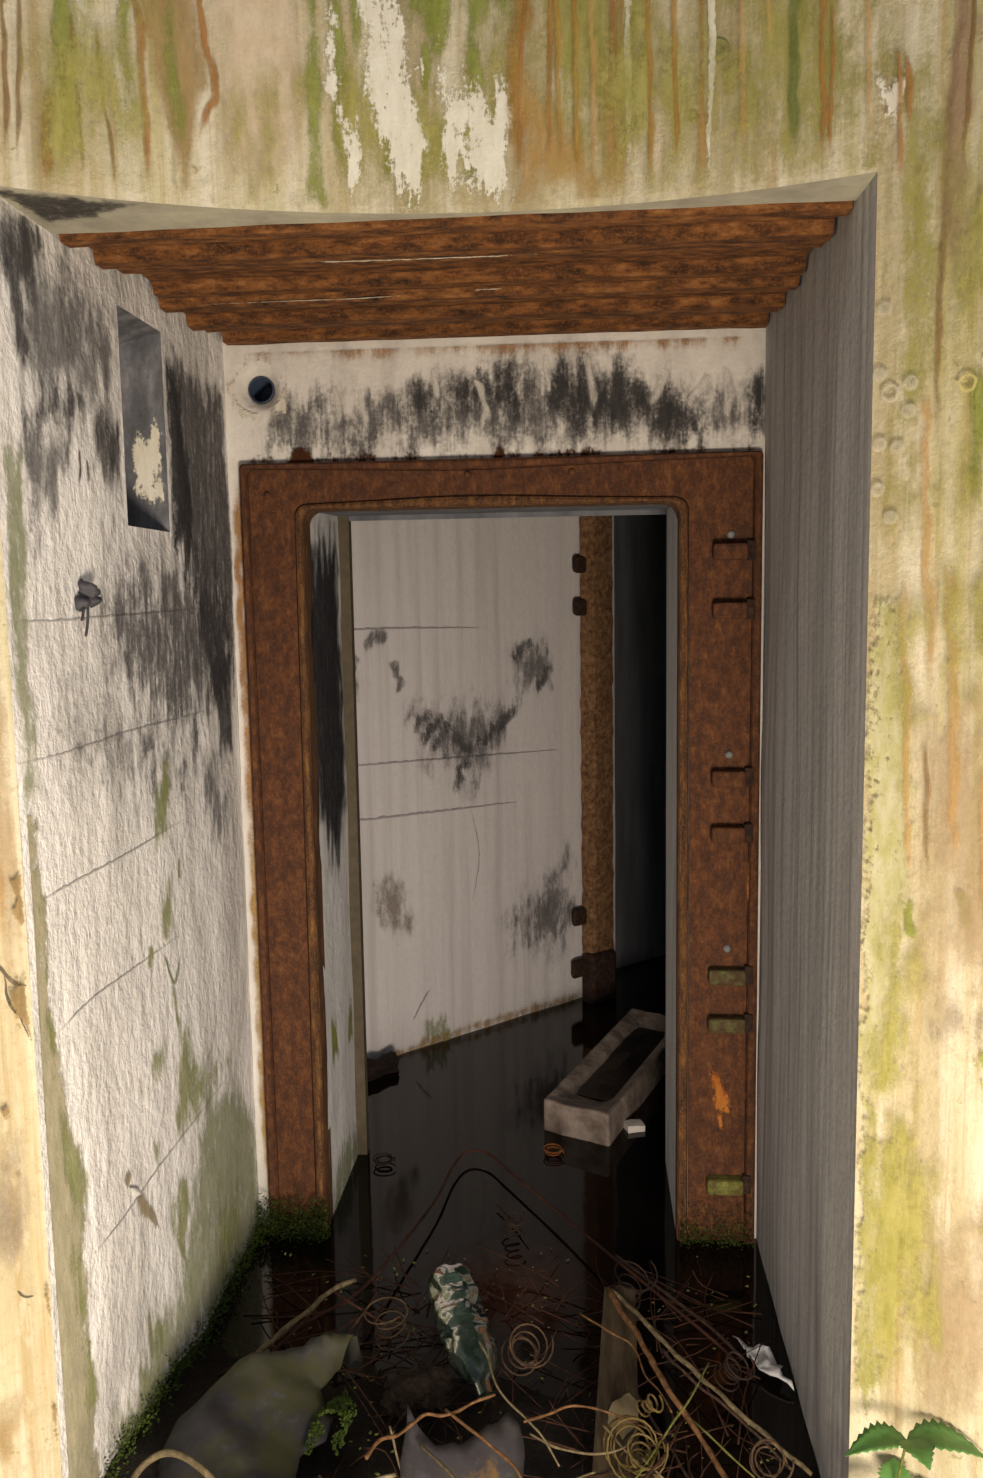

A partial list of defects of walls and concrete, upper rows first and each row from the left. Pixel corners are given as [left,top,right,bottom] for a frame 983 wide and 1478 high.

rust [131,0,150,168]
peeling [322,0,514,207]
rust [508,0,625,183]
peeling [876,73,906,123]
rust [249,448,418,464]
leakage [475,380,490,417]
rust [459,447,600,458]
leakage [583,354,597,401]
leakage [969,374,983,495]
rust [234,501,267,1163]
leakage [934,734,983,961]
leakage [149,947,180,1025]